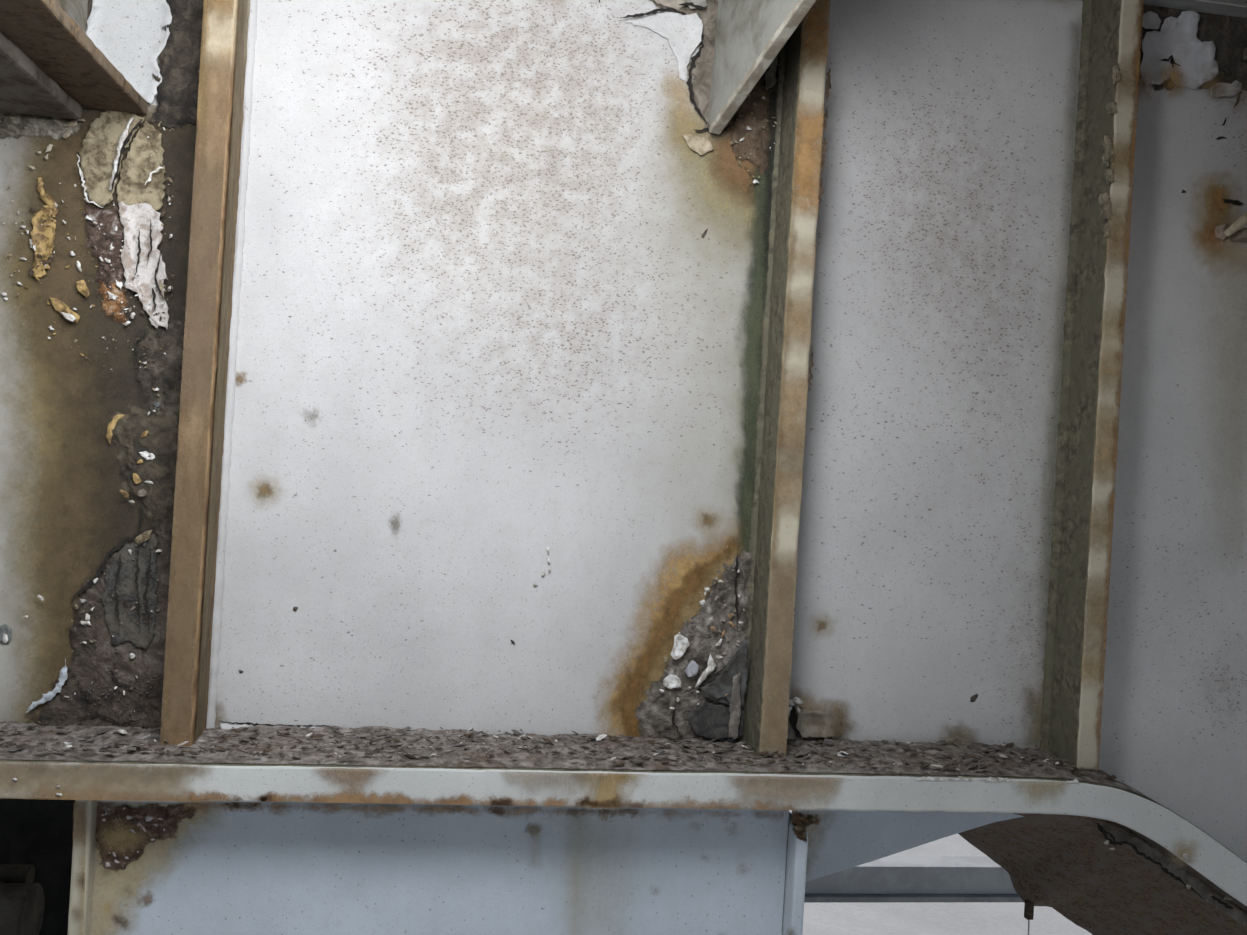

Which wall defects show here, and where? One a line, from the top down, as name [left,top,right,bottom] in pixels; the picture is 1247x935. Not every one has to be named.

peeling [0,0,205,372]
spalling [620,0,718,147]
corrosion [682,54,780,233]
damp [737,50,781,552]
corrosion [759,0,844,755]
peeling [1139,5,1247,97]
corrosion [1195,180,1243,259]
corrosion [606,529,754,740]
corrosion [0,762,821,935]
crack [1092,820,1247,926]